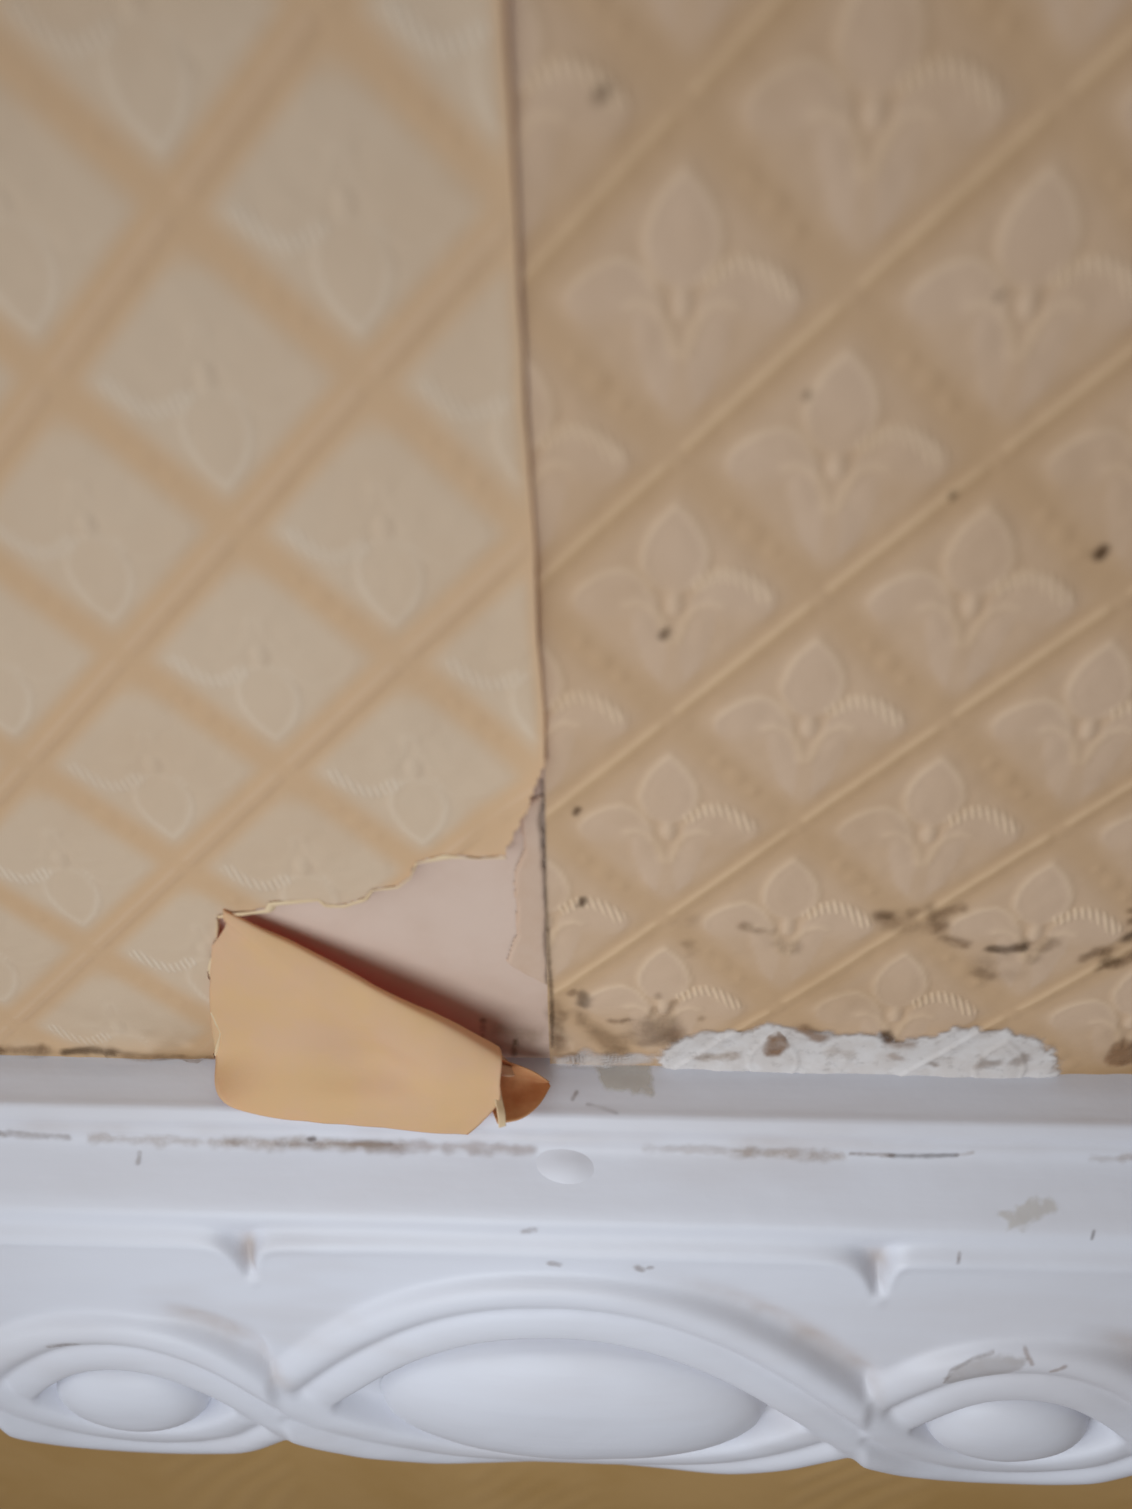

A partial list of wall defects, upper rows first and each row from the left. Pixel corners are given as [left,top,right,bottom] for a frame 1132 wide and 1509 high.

leakage [767,1029,825,1055]
leakage [1107,1042,1132,1066]